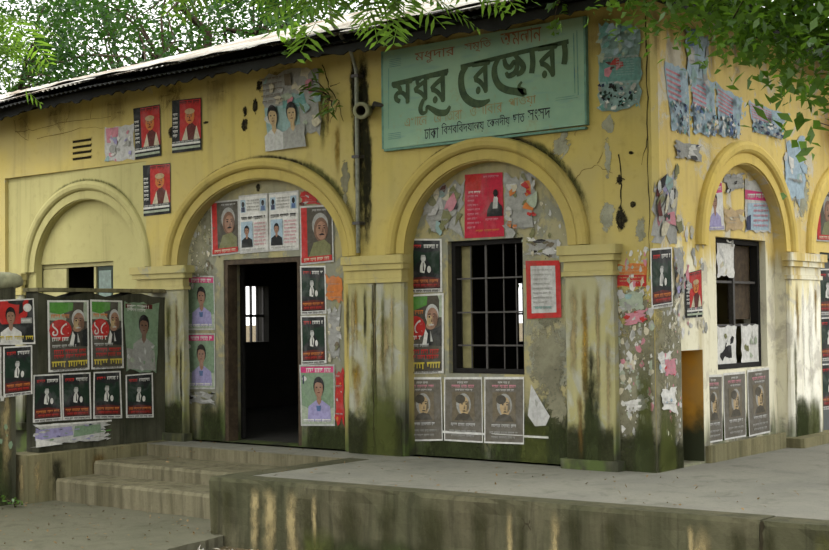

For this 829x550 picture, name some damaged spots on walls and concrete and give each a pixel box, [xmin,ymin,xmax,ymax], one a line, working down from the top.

damp [350,63,371,226]
peeling [601,114,614,179]
damp [346,293,393,393]
damp [1,397,10,459]